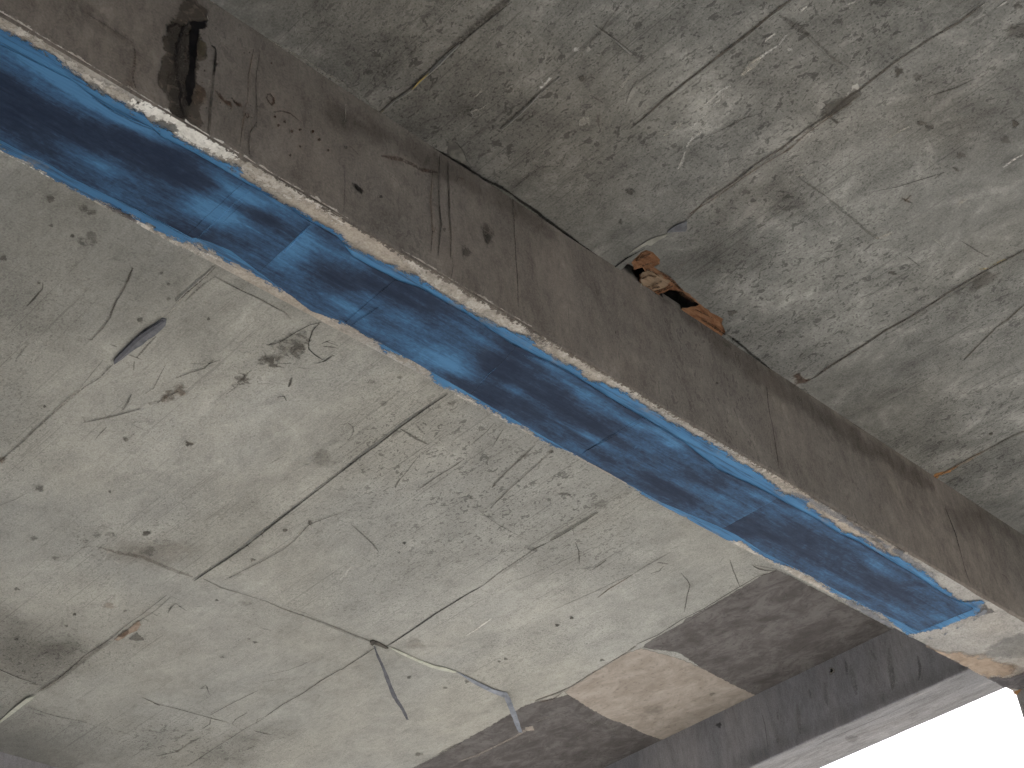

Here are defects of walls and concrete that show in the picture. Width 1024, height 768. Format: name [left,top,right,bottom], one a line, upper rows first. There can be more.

spalling [0,11,985,635]